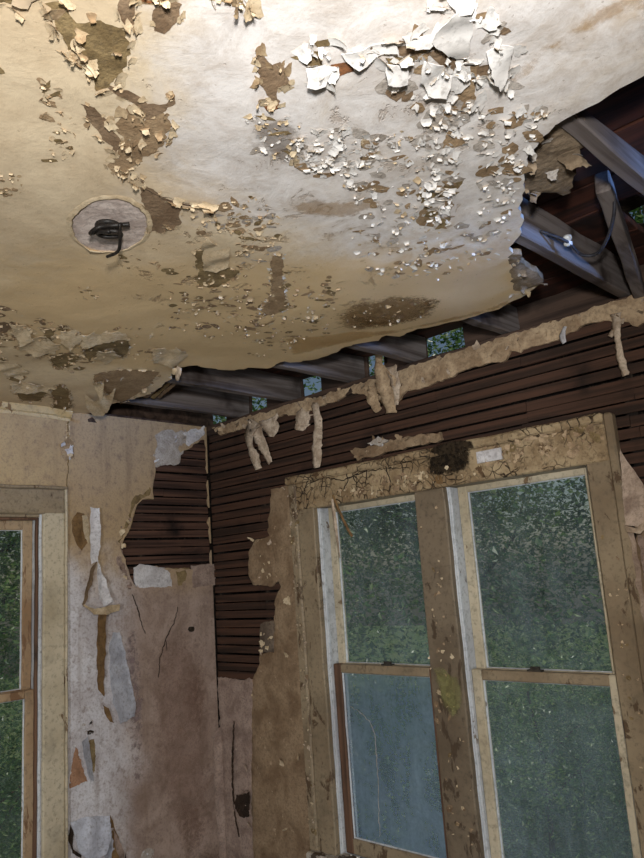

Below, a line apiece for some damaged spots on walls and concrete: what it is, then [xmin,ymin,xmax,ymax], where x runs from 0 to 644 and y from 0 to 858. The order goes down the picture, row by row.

peeling [242,0,591,298]
water stain [339,297,434,329]
crack [304,456,409,491]
peeling [338,466,449,499]
peeling [461,423,605,477]
spalling [116,487,154,589]
crack [132,595,178,678]